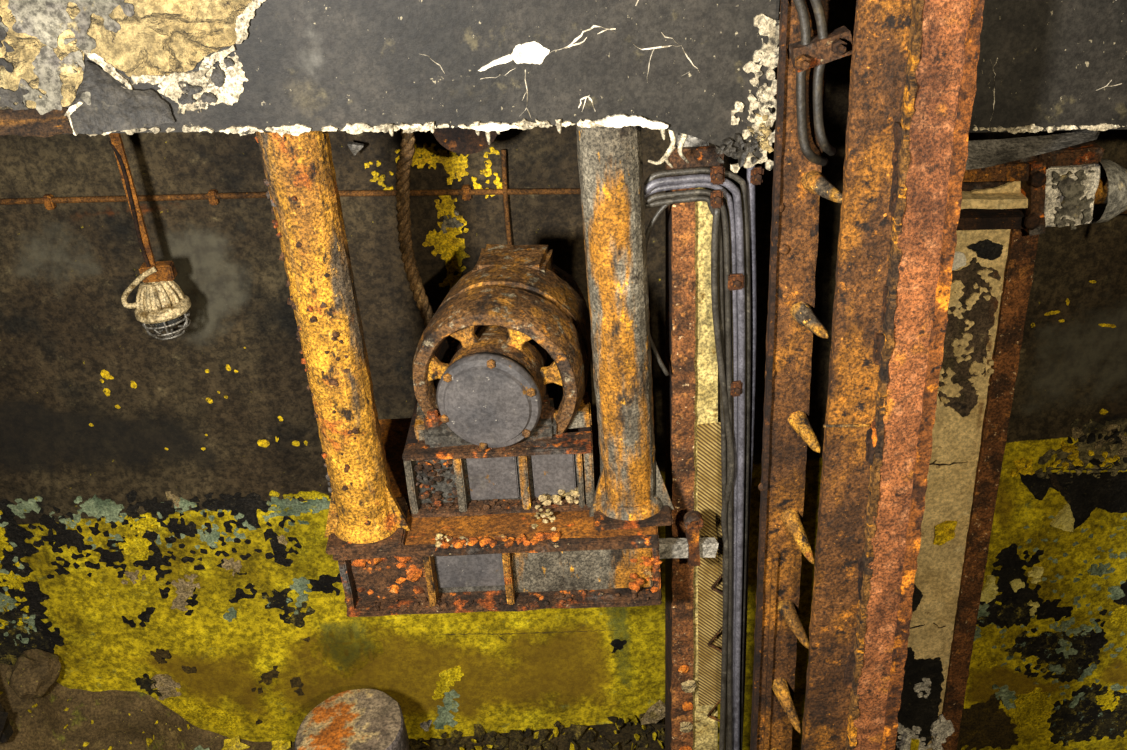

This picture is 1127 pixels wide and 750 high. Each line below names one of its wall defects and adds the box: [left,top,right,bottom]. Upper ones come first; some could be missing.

flaking render [0,0,266,136]
crack [549,25,616,53]
crack [578,95,595,111]
crack [637,32,699,77]
spalling [715,13,779,173]
spalling [648,129,689,168]
corrosion [286,280,327,371]
peeling [938,239,1003,417]
corrosion [321,331,349,387]
corrosion [321,445,353,494]
damp [151,657,261,713]
damp [280,628,607,715]